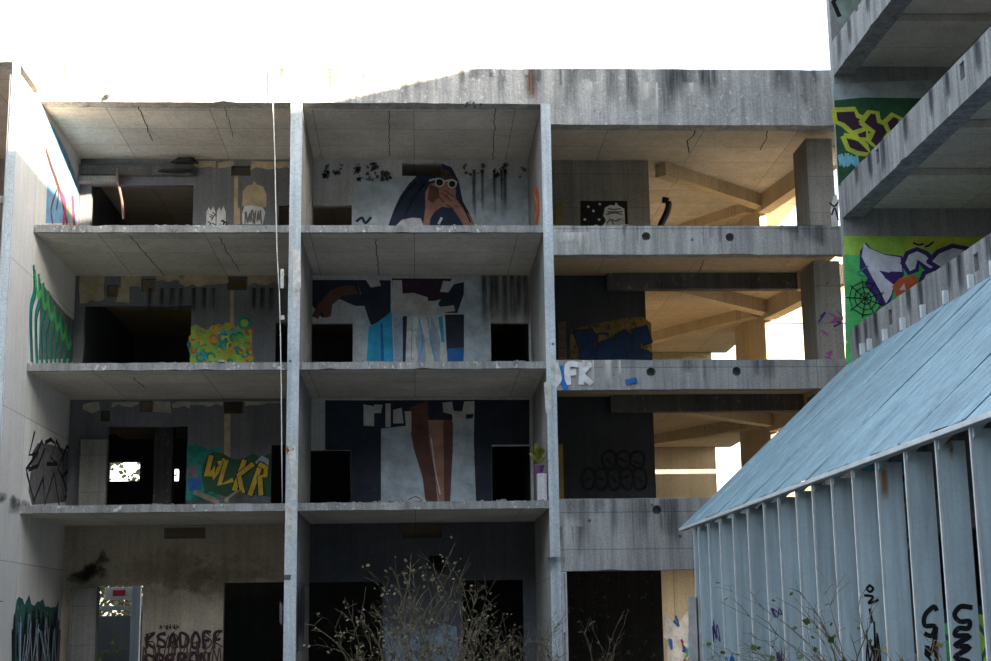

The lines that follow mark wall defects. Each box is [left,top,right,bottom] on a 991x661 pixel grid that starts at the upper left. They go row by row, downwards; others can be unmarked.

leakage [463,163,509,202]
peeling [116,276,141,303]
peeling [156,276,234,326]
peeling [248,250,301,314]
leakage [482,275,528,315]
peeling [152,401,230,457]